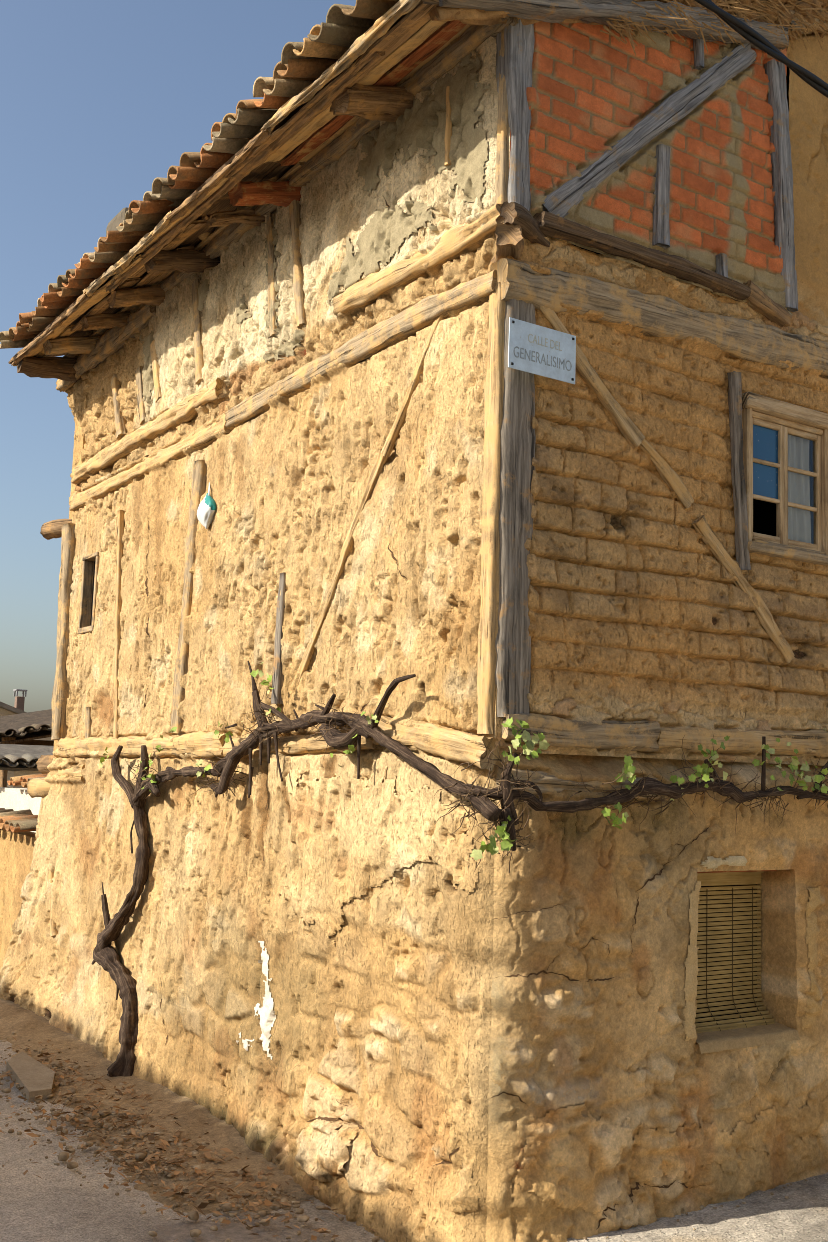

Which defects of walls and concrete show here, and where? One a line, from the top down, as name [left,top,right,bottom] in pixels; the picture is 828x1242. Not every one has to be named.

crack [496,827,709,982]
peeling [236,941,276,1059]
crack [307,1101,384,1158]
crack [596,1180,712,1230]